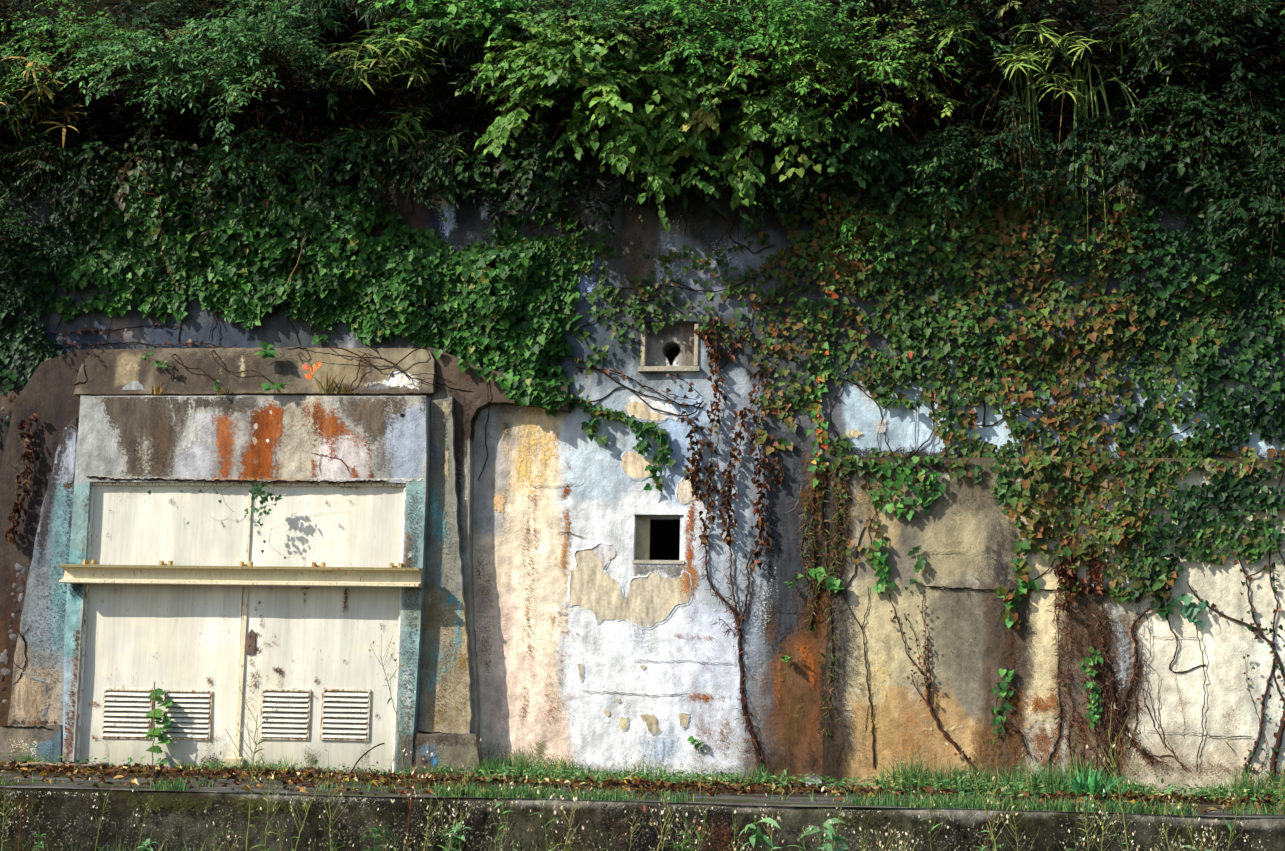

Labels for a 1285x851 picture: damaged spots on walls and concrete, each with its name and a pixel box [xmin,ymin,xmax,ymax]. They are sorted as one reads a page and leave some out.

peeling [53,423,421,509]
corrosion [202,397,374,504]
peeling [625,395,679,423]
peeling [620,451,700,504]
water stain [1200,445,1284,459]
peeling [0,563,52,720]
water stain [0,348,425,762]
water stain [243,386,586,774]
peeling [553,541,693,630]
corrosion [671,500,828,764]
water stain [570,413,1145,784]
water stain [199,740,220,767]